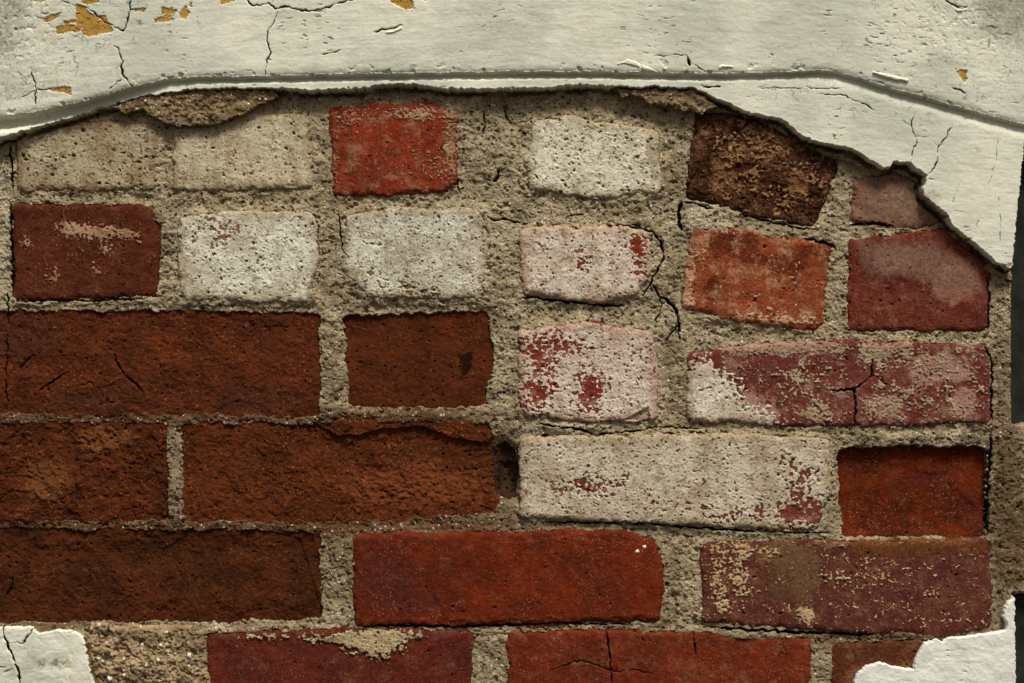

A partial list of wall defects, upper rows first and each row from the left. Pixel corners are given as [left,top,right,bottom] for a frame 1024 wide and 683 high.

crack [19,68,52,104]
crack [62,0,145,89]
peeling [15,89,314,193]
peeling [523,114,662,200]
crack [904,116,951,178]
peeling [177,210,321,304]
peeling [341,206,490,301]
peeling [518,225,652,304]
crack [623,224,681,342]
crack [832,360,887,425]
peeling [491,301,992,635]
crack [550,629,654,682]